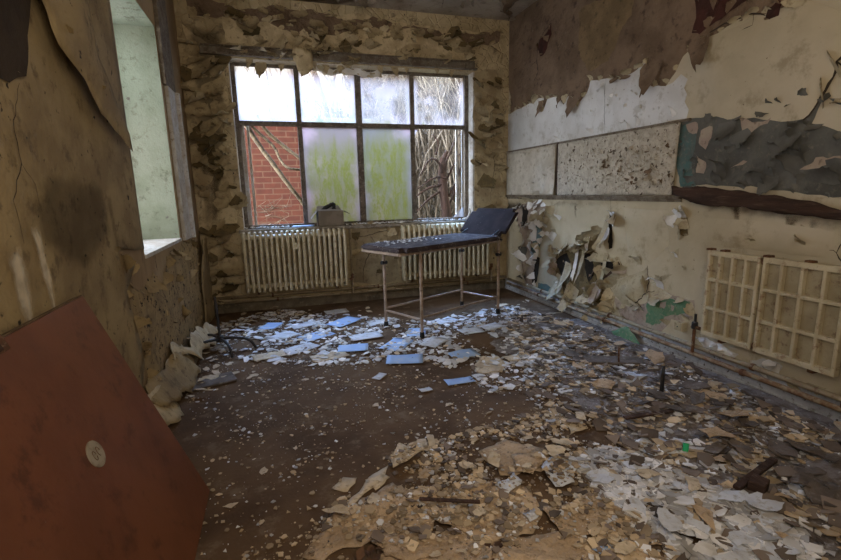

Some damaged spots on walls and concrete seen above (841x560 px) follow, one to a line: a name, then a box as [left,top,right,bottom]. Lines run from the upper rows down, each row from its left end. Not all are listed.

crack [803,57,841,120]